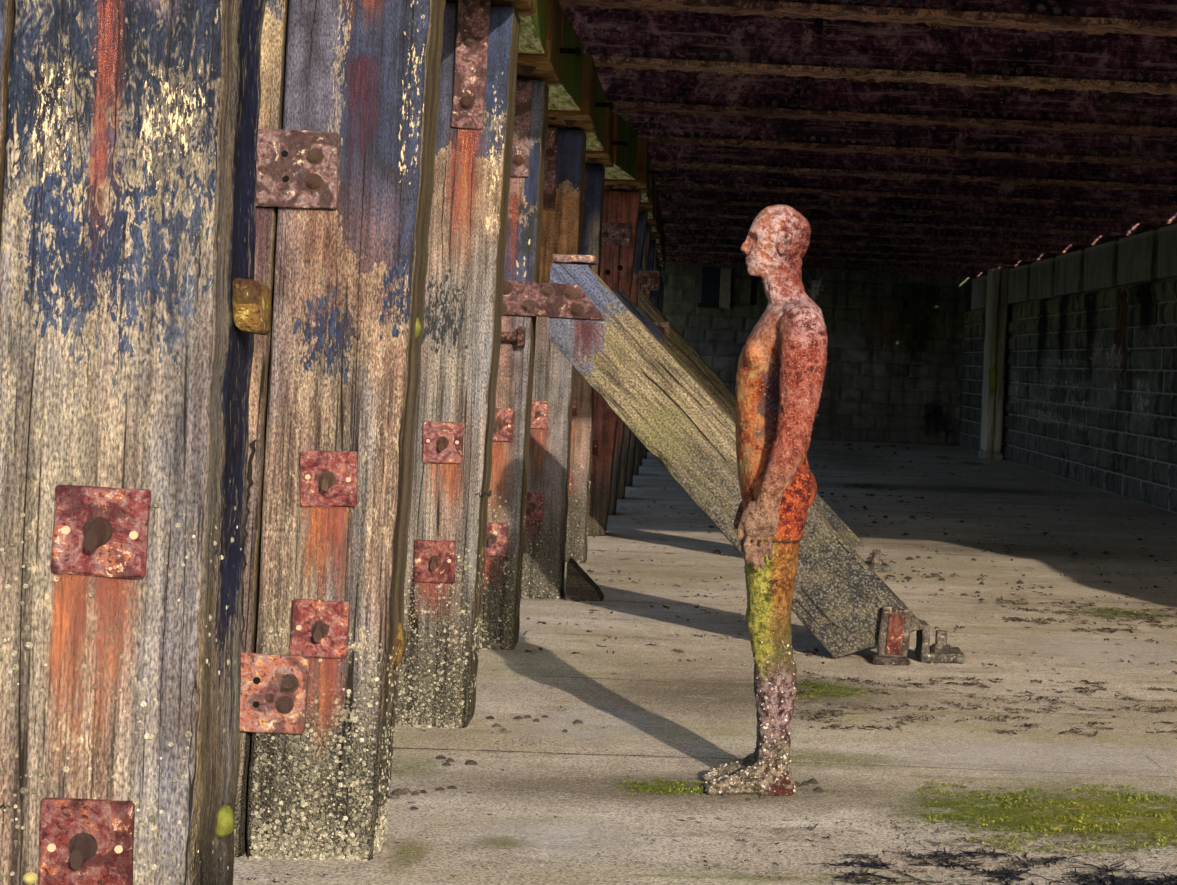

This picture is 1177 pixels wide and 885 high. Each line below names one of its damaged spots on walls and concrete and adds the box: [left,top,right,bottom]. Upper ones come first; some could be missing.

peeling [140,59,205,189]
peeling [18,54,133,352]
corrosion [450,128,478,236]
peeling [294,289,352,389]
damp [1032,291,1122,430]
corrosion [492,442,506,490]
corrosion [309,506,347,573]
corrosion [52,573,127,686]